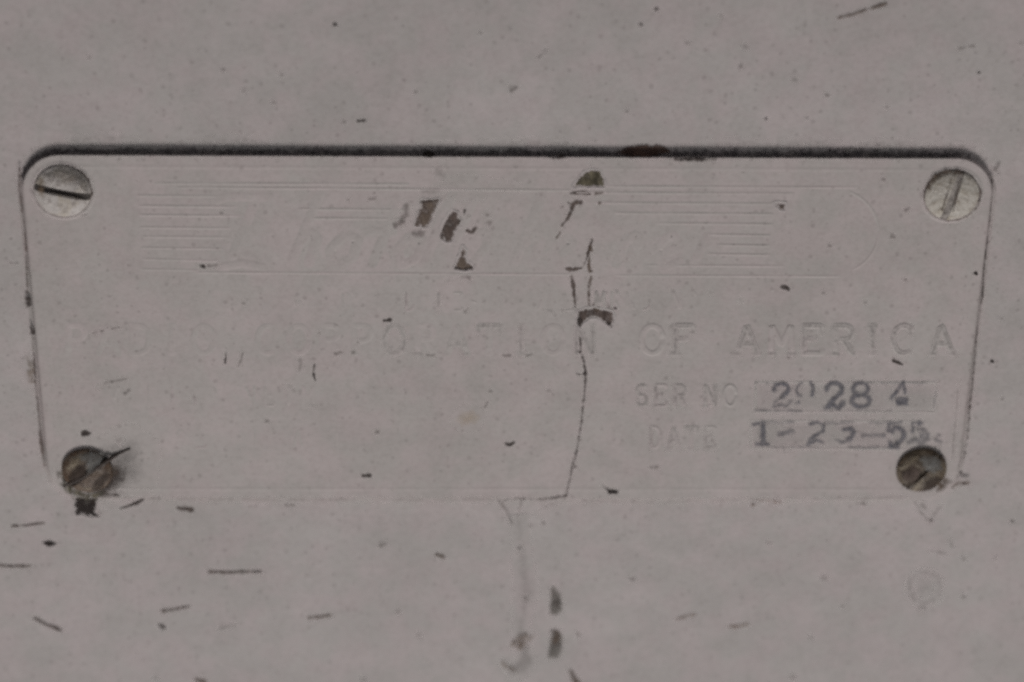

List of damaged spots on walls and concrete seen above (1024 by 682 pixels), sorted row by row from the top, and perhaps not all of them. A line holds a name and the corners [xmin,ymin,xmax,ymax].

peeling [412,197,476,273]
peeling [556,168,607,238]
crack [504,275,591,501]